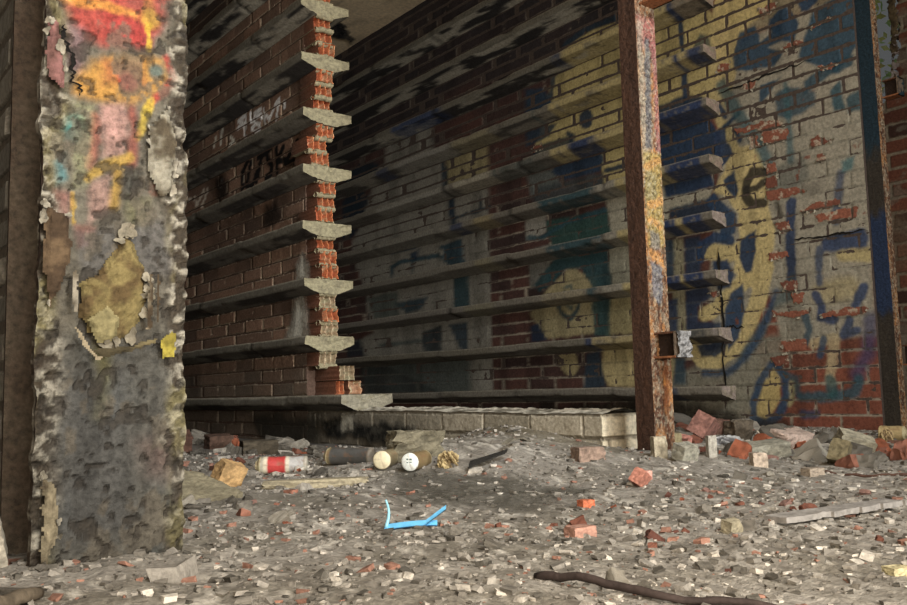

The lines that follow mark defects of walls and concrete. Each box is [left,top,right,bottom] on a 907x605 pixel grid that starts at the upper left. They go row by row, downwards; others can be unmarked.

peeling [42,16,68,88]
crack [719,59,813,94]
spalling [886,0,900,78]
peeling [146,105,179,197]
peeling [764,161,807,201]
peeling [800,198,859,223]
spalling [39,198,176,360]
peeling [772,279,869,319]
peeling [770,338,807,367]
peeling [39,470,63,564]